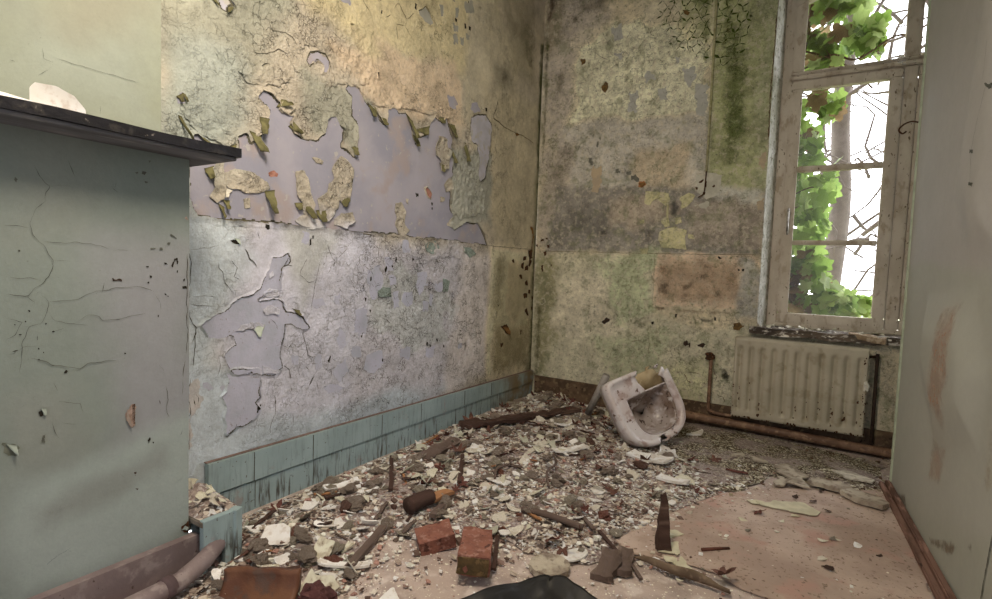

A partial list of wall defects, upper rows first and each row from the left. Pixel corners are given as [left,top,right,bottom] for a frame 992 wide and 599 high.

peeling [177,92,211,143]
peeling [214,0,237,16]
peeling [304,48,331,76]
peeling [415,0,474,45]
crack [571,0,751,131]
crack [768,15,777,138]
peeling [185,78,493,374]
crack [6,161,161,435]
crack [159,219,298,416]
peeling [196,249,311,437]
crack [267,320,356,435]